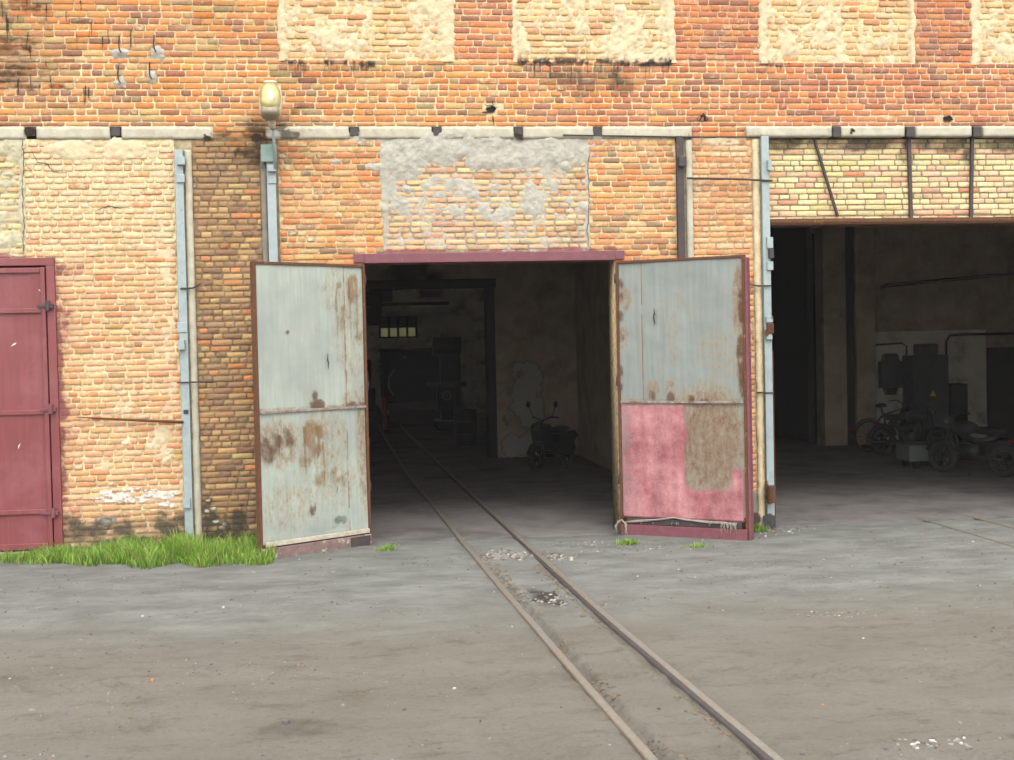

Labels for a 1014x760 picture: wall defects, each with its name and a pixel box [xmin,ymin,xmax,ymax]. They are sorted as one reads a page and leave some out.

rust [312,392,325,408]
rust [262,423,325,464]